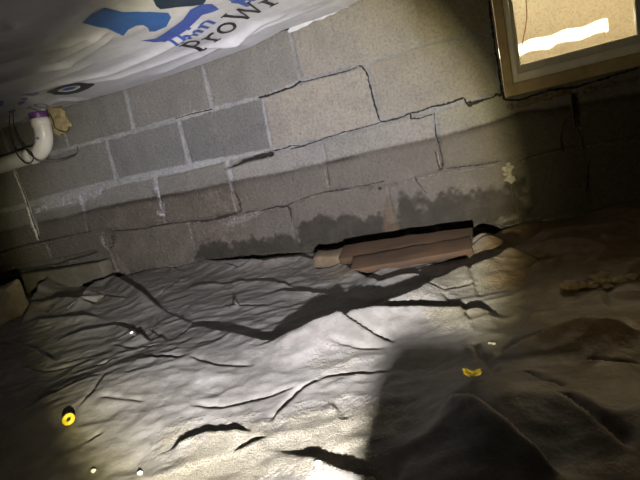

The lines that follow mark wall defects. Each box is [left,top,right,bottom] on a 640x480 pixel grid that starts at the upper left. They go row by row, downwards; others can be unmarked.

crack [114,168,385,231]
water stain [30,93,640,277]